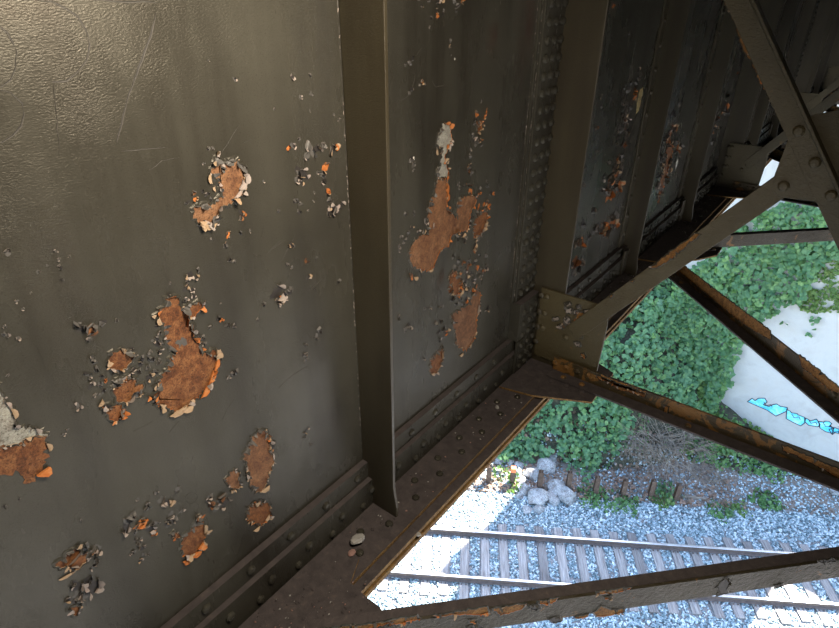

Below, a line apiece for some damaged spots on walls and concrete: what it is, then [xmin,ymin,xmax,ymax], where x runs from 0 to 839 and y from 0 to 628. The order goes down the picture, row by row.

peeling [184,146,251,263]
spalling [286,137,346,217]
peeling [398,99,495,376]
peeling [82,267,237,426]
corrosion [595,374,647,398]
corrosion [798,354,839,394]
peeling [0,373,53,484]
peeling [122,427,276,565]
corrosion [781,444,839,479]
corrosion [321,613,422,628]
corrosion [432,596,559,624]
corrosion [574,586,633,619]